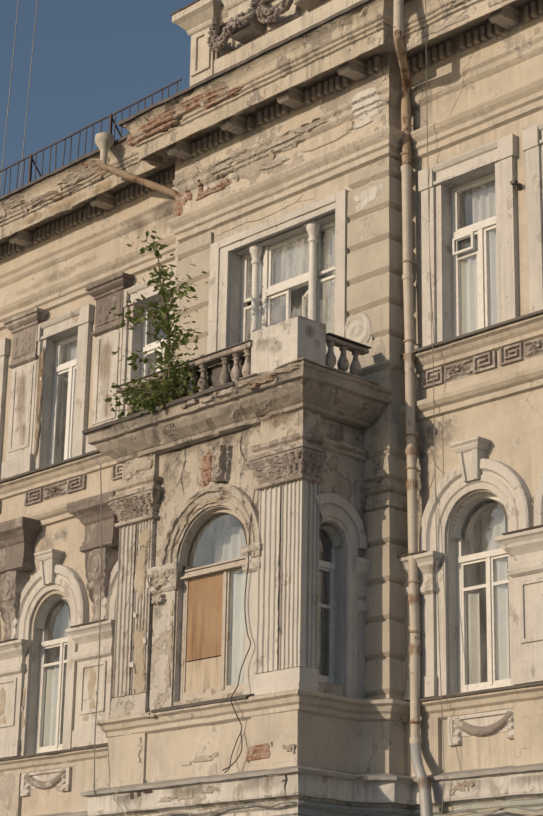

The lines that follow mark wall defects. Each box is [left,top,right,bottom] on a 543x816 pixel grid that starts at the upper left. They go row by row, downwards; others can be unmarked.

spalling [173,117,328,218]
peeling [353,184,383,213]
spalling [134,449,246,687]
crack [275,487,283,664]
peeling [129,628,148,695]
spalling [246,741,272,762]